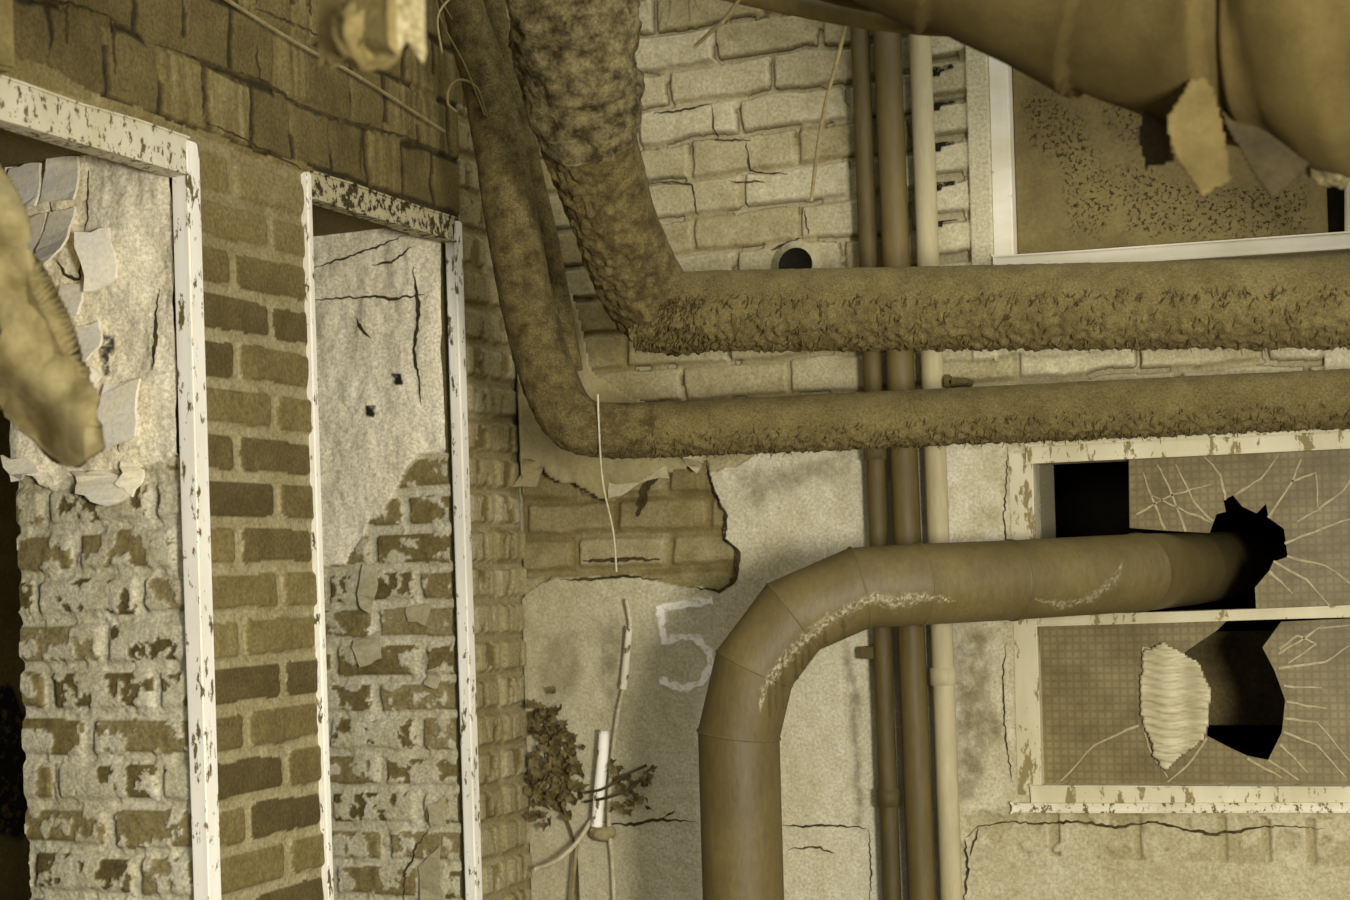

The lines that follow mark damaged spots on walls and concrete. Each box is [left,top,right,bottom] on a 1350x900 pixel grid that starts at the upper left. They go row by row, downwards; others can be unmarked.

peeling [8,156,141,451]
crack [314,234,424,403]
peeling [568,283,645,403]
peeling [1,455,45,482]
peeling [70,461,145,506]
flaking render [513,374,741,597]
peeling [352,631,382,668]
peeling [357,564,378,613]
peeling [406,603,433,626]
crack [963,820,1325,900]